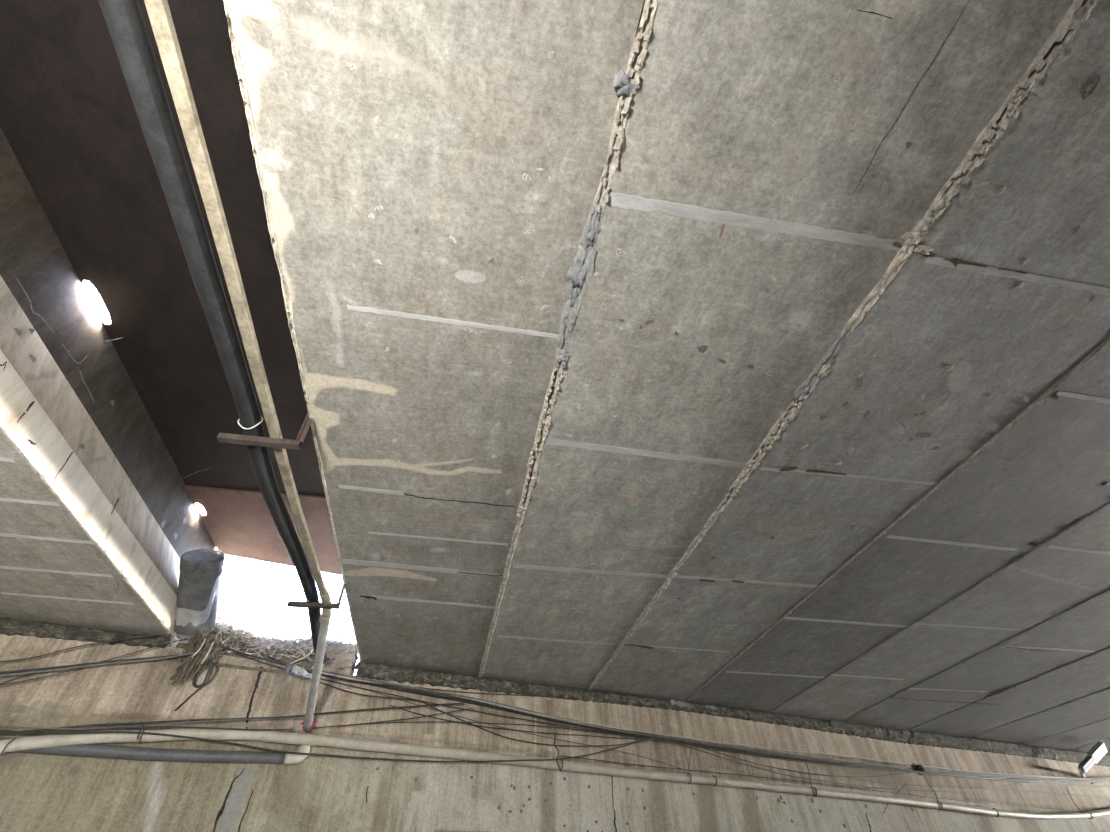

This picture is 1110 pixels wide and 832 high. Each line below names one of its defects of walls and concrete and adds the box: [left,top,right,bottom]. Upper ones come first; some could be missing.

crack [853,0,970,193]
leakage [298,276,505,479]
crack [405,494,514,507]